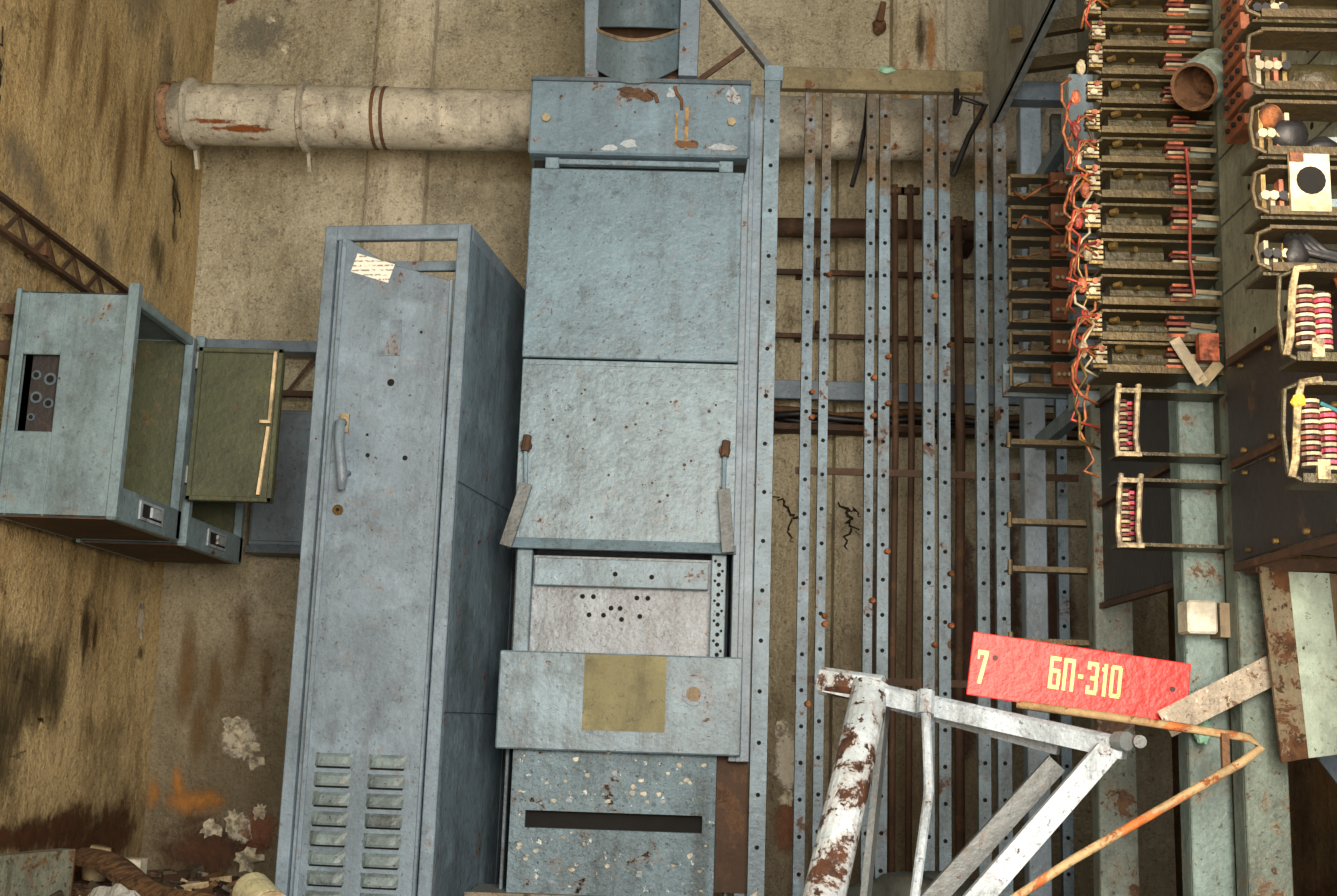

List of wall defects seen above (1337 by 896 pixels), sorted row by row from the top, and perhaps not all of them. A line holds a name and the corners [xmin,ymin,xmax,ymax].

crack [0,26,8,101]
crack [772,496,811,542]
crack [837,502,860,550]
leakage [81,601,97,663]
leakage [0,622,66,787]
rust [150,770,221,812]
leakage [0,801,135,881]
leakage [162,814,268,875]